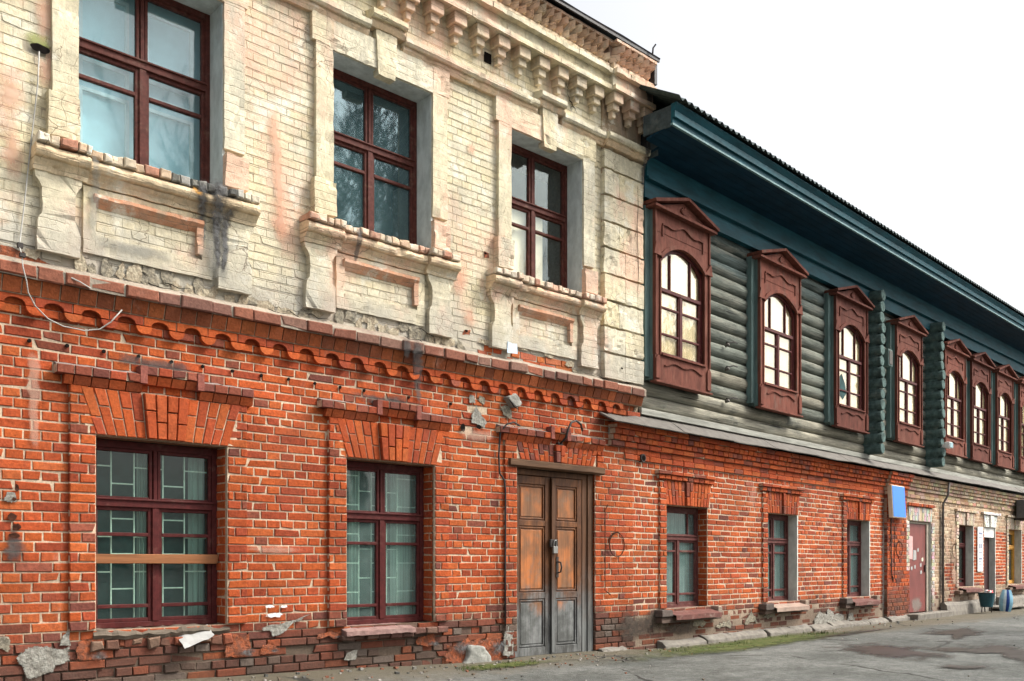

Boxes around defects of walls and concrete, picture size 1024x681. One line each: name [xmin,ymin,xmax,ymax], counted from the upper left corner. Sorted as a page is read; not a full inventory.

leakage [193,181,234,269]
flaking render [73,252,608,380]
spalling [225,633,278,657]
spalling [317,630,342,639]
spalling [416,633,505,663]